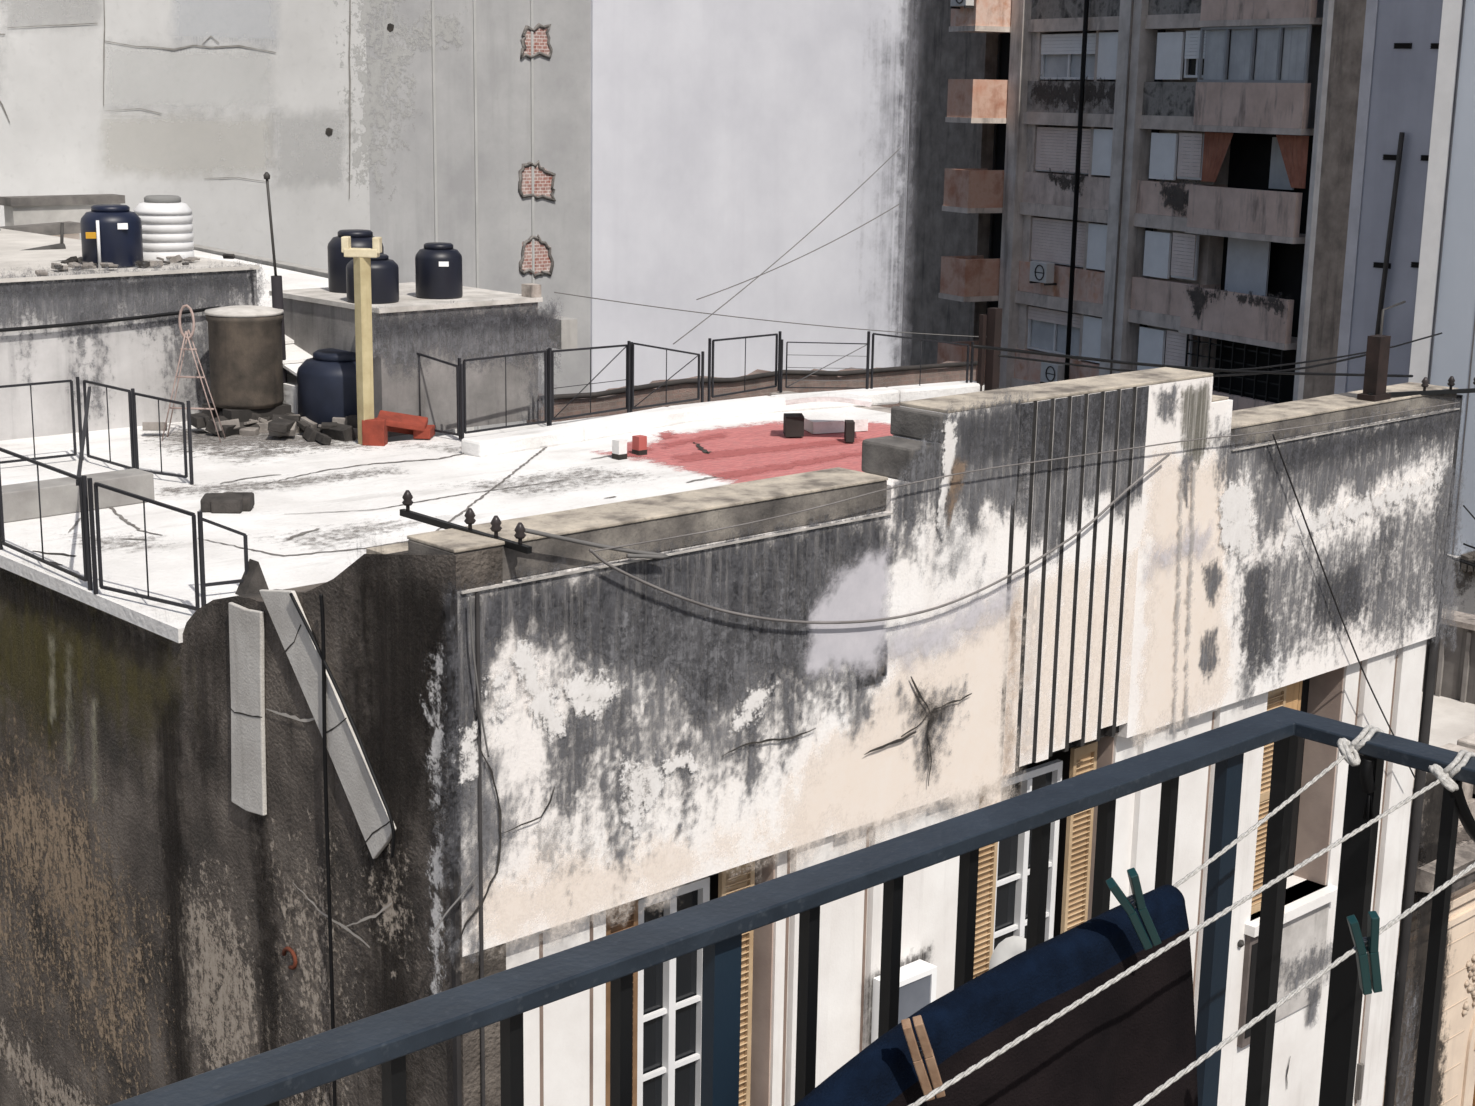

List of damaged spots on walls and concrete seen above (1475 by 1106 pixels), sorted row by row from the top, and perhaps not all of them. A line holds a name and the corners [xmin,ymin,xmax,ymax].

crack [0,4,276,114]
crack [346,0,354,199]
flaking render [520,23,553,59]
flaking render [519,234,554,278]
flaking render [518,160,556,201]
damp [0,260,378,463]
damp [0,569,223,1082]
damp [272,384,1475,1025]
crack [864,677,972,786]
damp [250,814,281,1052]
damp [1385,890,1452,1106]